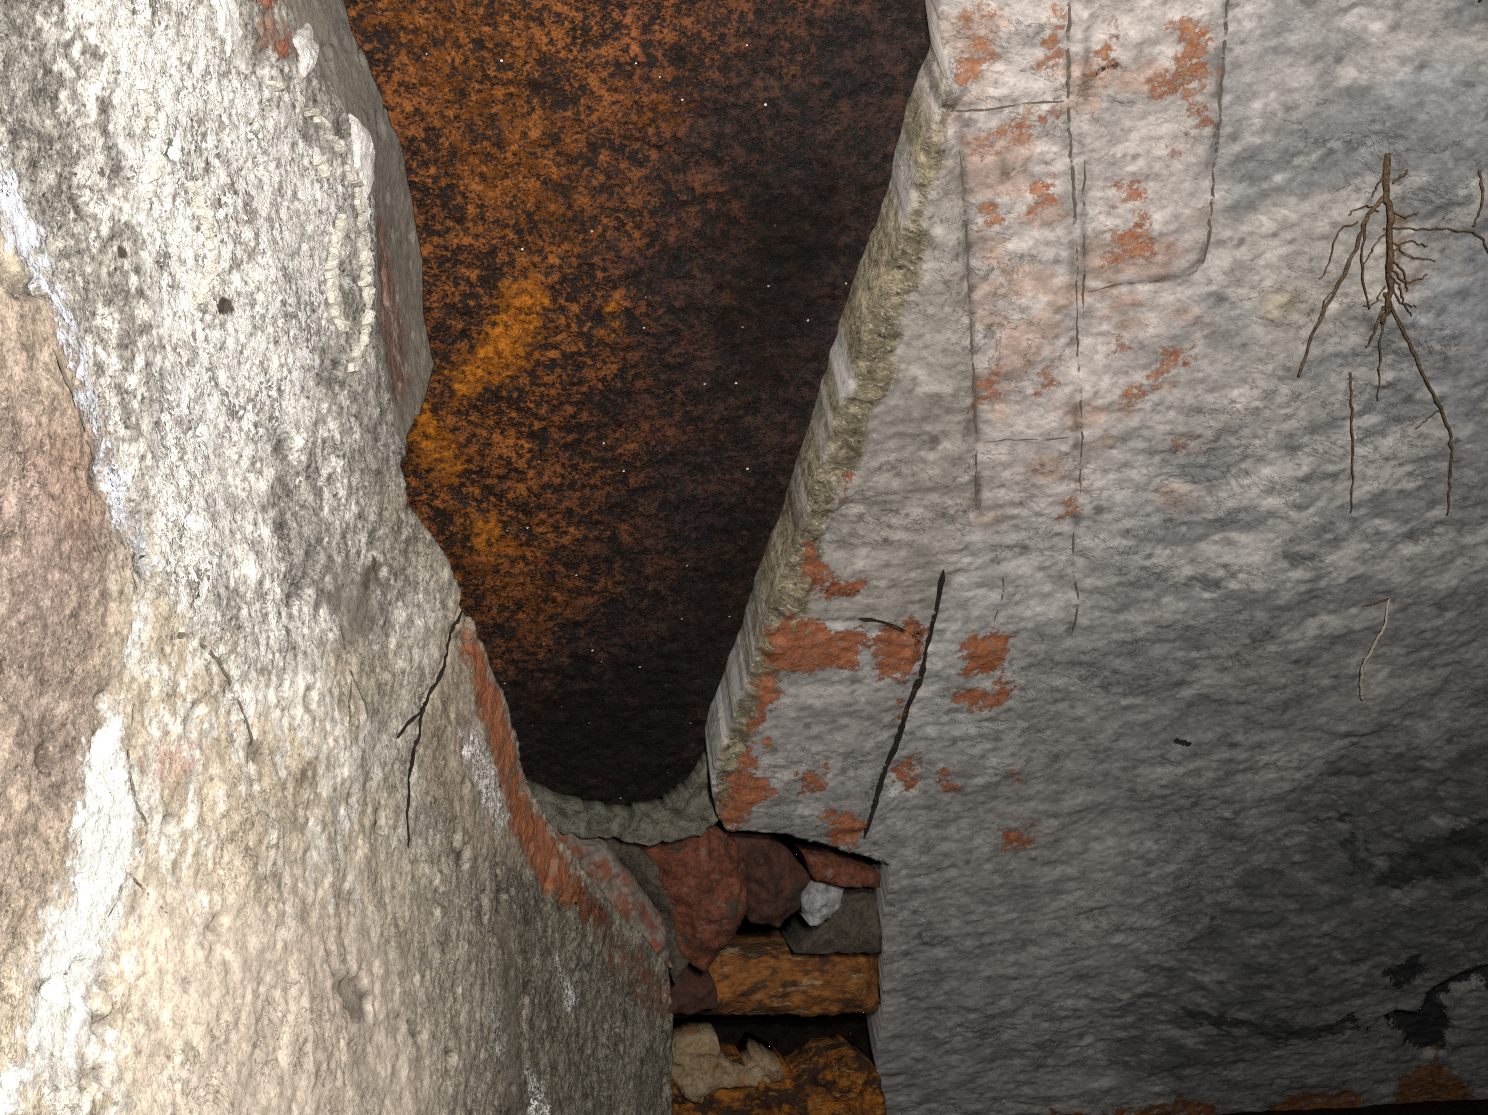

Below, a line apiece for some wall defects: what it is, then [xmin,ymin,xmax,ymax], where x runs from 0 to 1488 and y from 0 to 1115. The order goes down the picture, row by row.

rust [361,0,593,252]
peeling [1035,3,1068,71]
peeling [1147,16,1220,134]
peeling [1101,180,1170,268]
rust [437,271,553,409]
rust [407,397,467,482]
crack [340,603,463,848]
flaking render [715,611,930,832]
crack [859,569,945,839]
flaking render [948,629,1017,713]
leakage [1091,728,1488,1079]
rust [671,1033,887,1115]